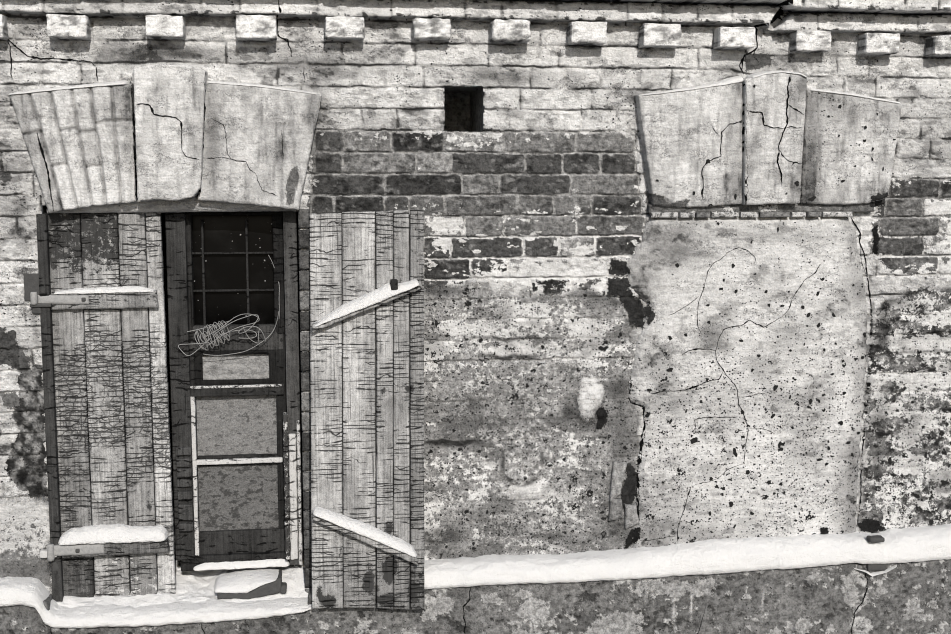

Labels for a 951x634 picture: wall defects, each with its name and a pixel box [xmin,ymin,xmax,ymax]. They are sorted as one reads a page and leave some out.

crack [2,38,98,81]
crack [130,72,275,200]
crack [701,0,806,202]
peeling [285,126,695,328]
peeling [868,176,951,282]
peeling [0,327,49,504]
crack [621,247,821,542]
crack [463,588,471,634]
crack [840,563,868,634]